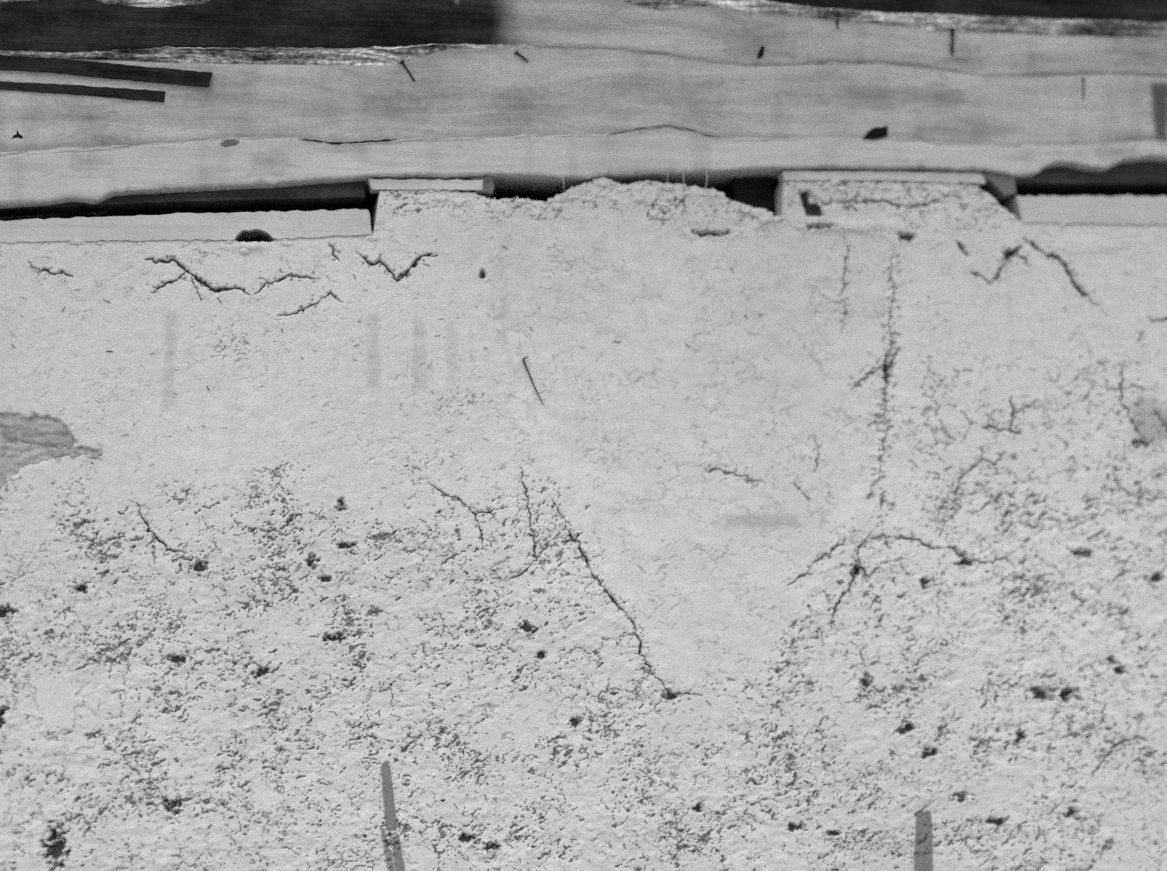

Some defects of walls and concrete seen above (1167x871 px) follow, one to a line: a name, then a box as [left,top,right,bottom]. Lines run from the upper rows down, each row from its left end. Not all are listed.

spalling [470,176,495,198]
flaking render [800,192,886,233]
crack [145,244,438,316]
crack [957,237,1099,306]
crack [850,254,898,499]
crack [1119,364,1167,445]
crack [955,396,1037,497]
crack [1083,466,1167,502]
crack [428,467,701,696]
crack [791,534,1015,629]